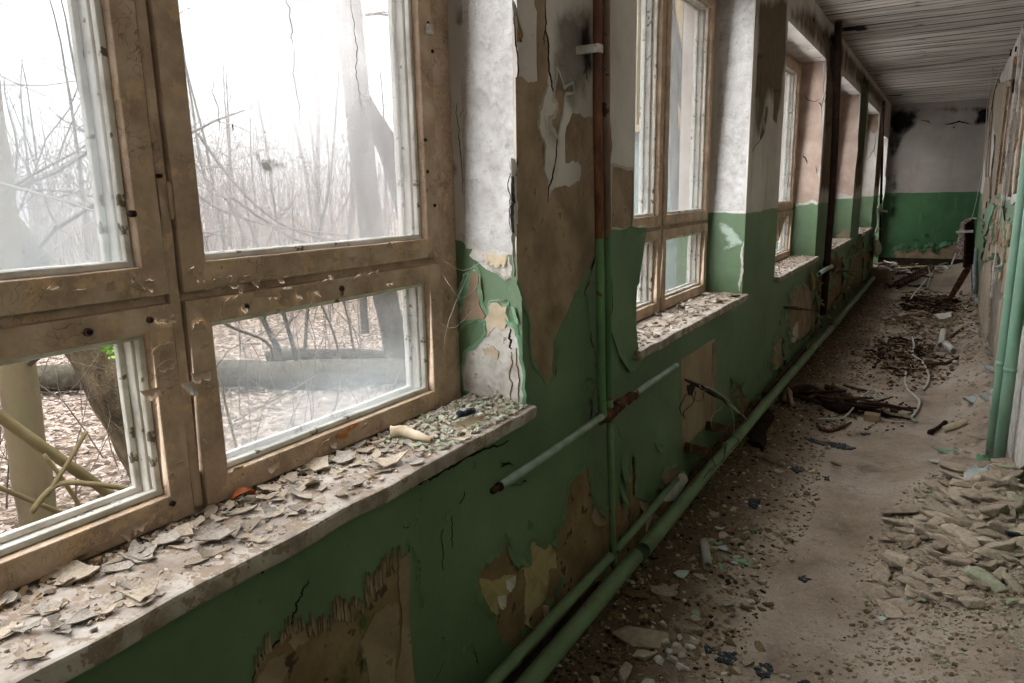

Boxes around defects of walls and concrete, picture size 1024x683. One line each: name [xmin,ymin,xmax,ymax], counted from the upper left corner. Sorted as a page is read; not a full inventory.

crack [543,0,554,92]
leakage [756,0,916,190]
peeling [455,0,595,405]
crack [548,139,558,200]
peeling [980,194,1014,282]
flaking render [681,339,716,451]
peeling [473,443,679,672]
crack [252,580,309,683]
peeling [252,545,415,683]